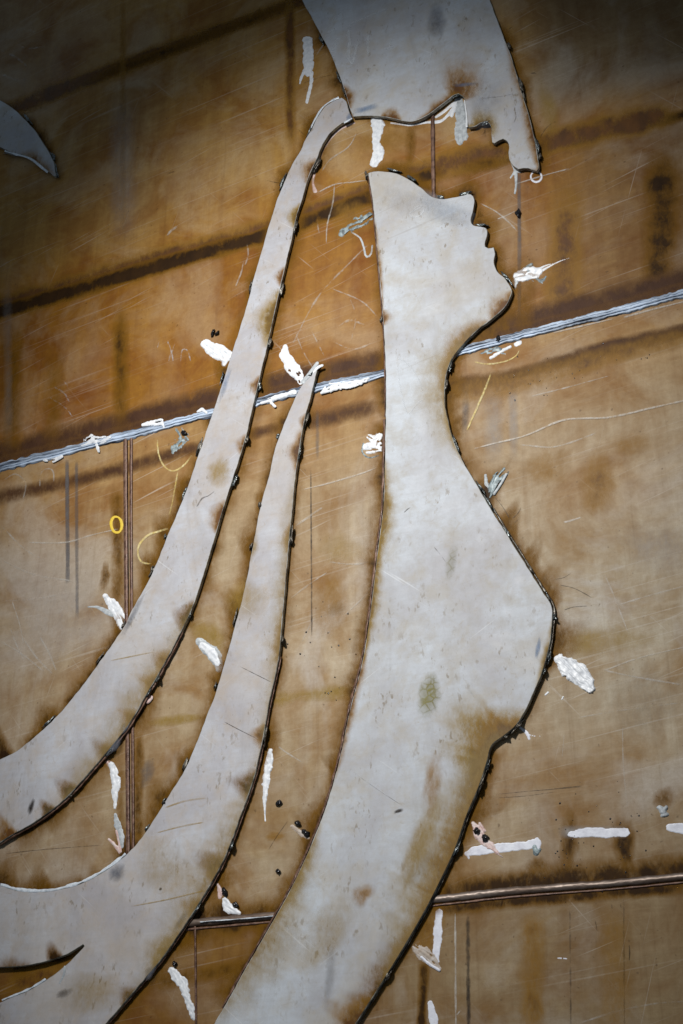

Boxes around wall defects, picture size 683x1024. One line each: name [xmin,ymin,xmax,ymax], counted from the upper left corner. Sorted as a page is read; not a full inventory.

rust [503,33,683,175]
rust [372,116,683,508]
rust [0,144,392,1016]
rust [339,697,683,1024]